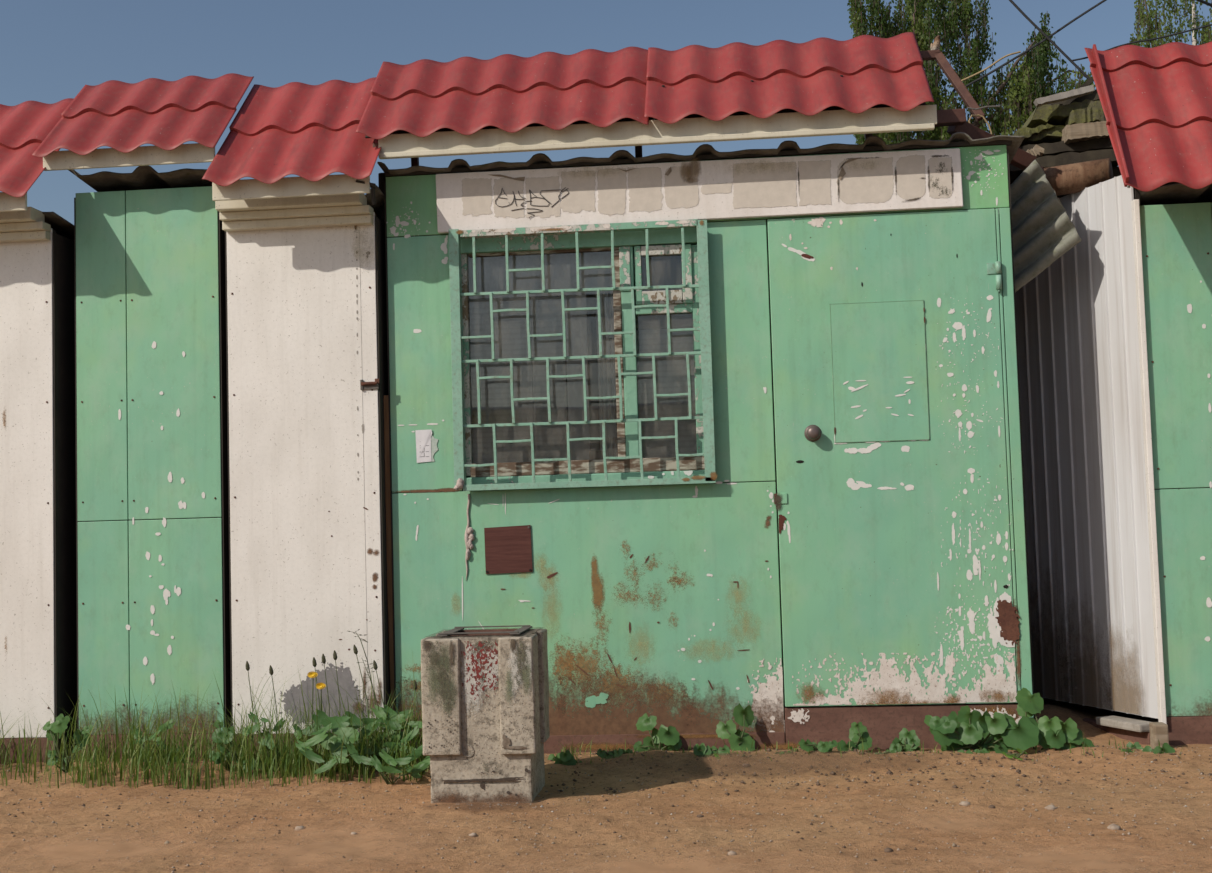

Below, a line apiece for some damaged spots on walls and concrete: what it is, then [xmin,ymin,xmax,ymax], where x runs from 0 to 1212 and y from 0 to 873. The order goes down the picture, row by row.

peeling [925,295,1003,453]
corrosion [766,494,786,534]
peeling [149,575,181,655]
corrosion [549,541,800,750]
peeling [736,468,1022,732]
corrosion [995,585,1021,679]
corrosion [398,666,423,738]